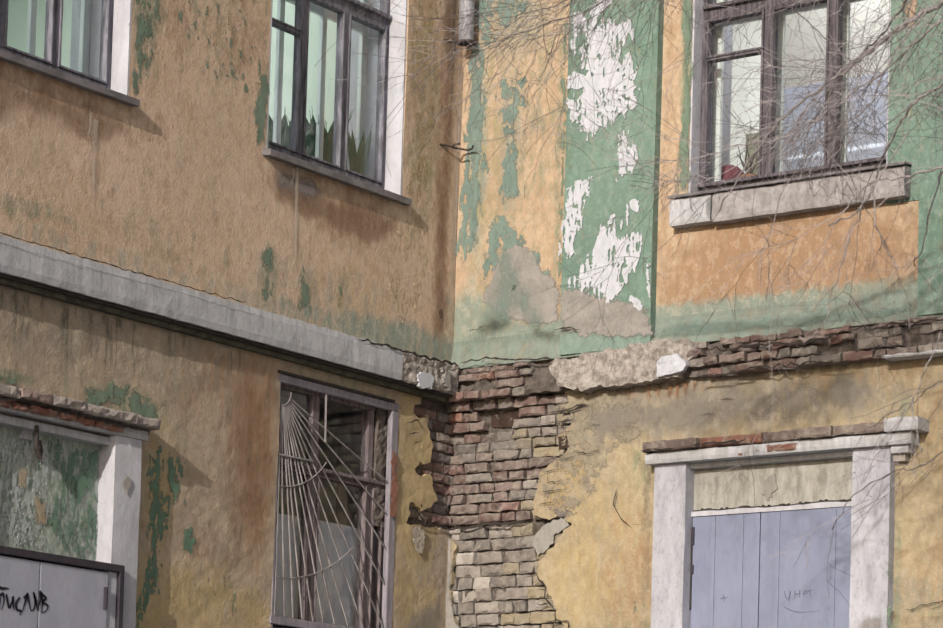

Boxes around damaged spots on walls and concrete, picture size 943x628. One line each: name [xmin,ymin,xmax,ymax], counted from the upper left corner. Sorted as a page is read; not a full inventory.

peeling [129,0,160,94]
peeling [178,0,271,146]
spalling [372,0,943,628]
peeling [85,382,158,418]
peeling [0,429,99,559]
peeling [135,445,185,628]